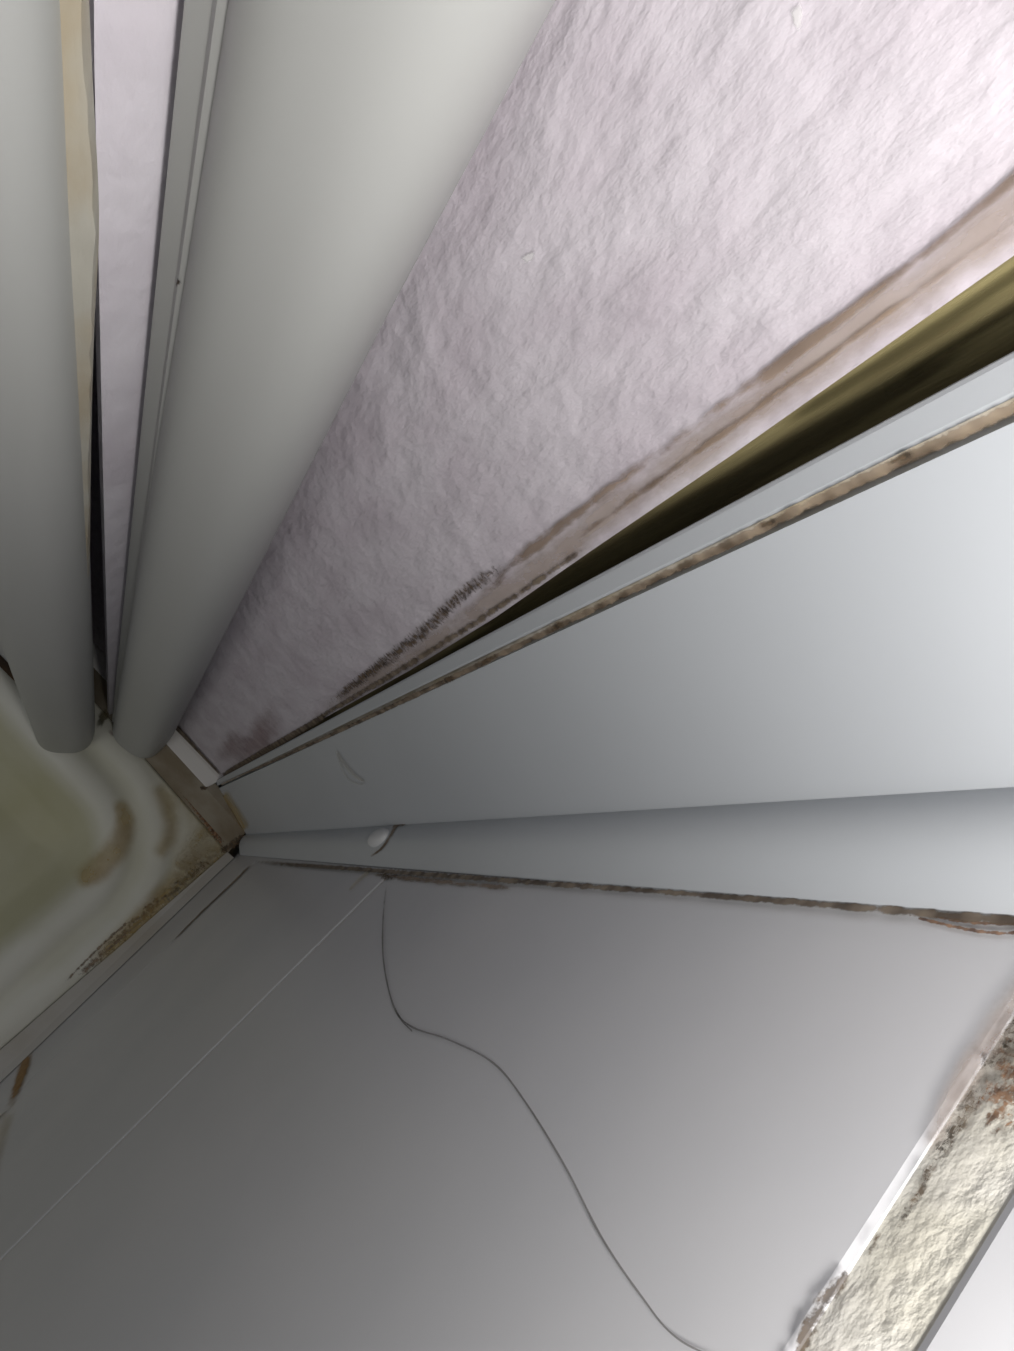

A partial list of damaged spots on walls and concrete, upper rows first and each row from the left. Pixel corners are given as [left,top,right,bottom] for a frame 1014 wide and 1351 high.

damp [69,174,1014,978]
rust [11,1057,30,1098]
crack [381,873,701,1351]
damp [796,1271,849,1351]